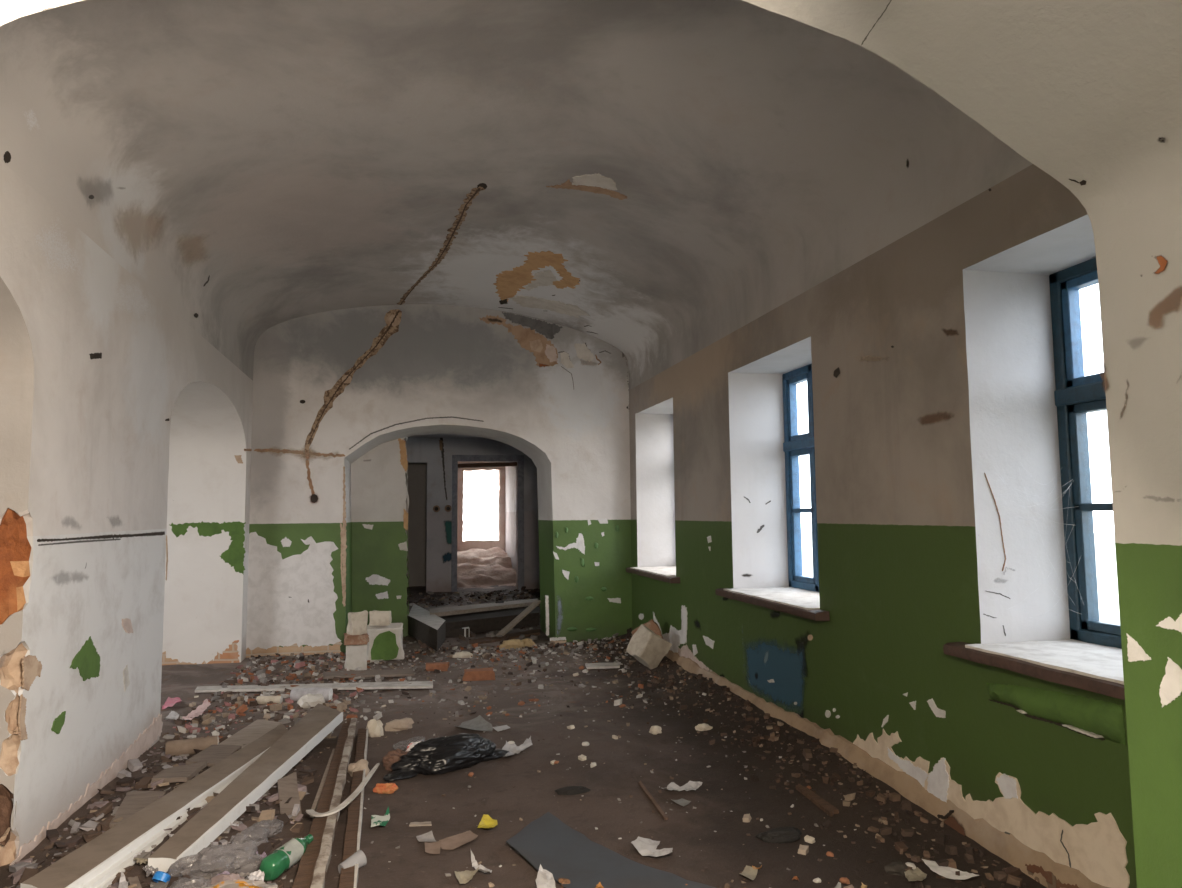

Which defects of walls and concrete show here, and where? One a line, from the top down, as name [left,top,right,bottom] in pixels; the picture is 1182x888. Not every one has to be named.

crack [861,0,892,45]
crack [244,186,485,500]
flaking render [480,251,624,387]
damp [1149,287,1182,328]
flaking render [0,508,31,625]
peeling [162,466,347,665]
peeling [553,518,608,579]
peeling [1126,633,1151,662]
peeling [1156,613,1182,633]
peeling [1159,657,1182,707]
flaking render [0,641,163,867]
peeling [853,715,1130,888]